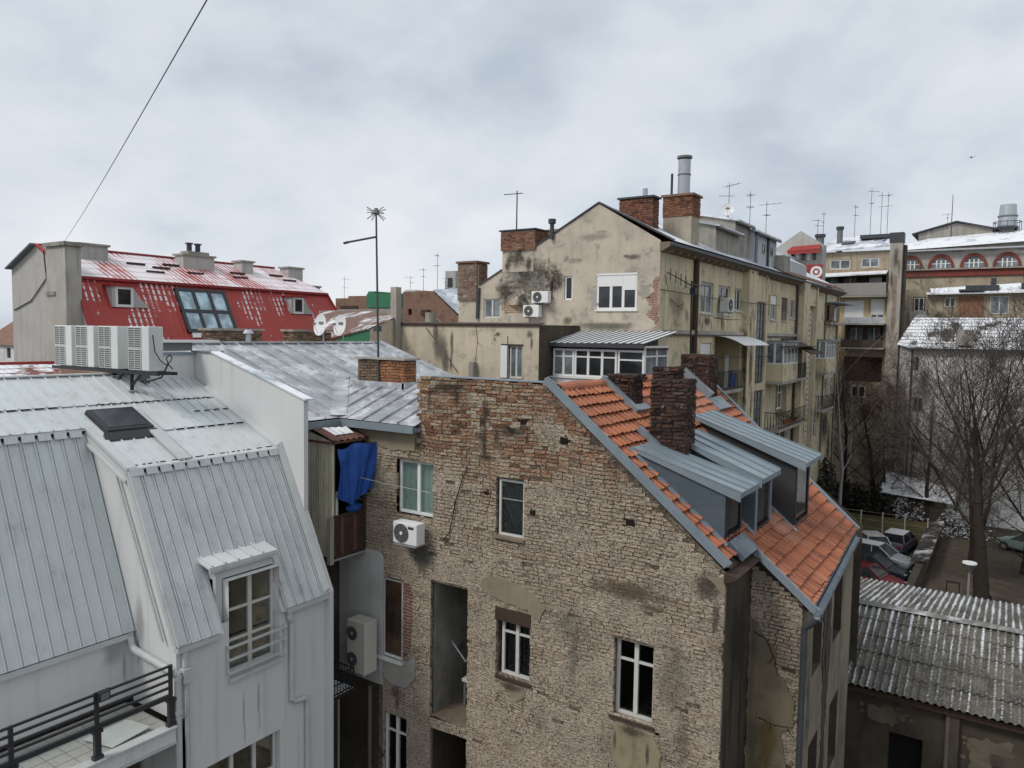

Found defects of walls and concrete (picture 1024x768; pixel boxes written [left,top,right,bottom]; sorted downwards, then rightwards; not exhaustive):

mould [500,250,563,307]
peeling [640,276,660,328]
peeling [744,617,798,768]
peeling [958,735,1016,768]